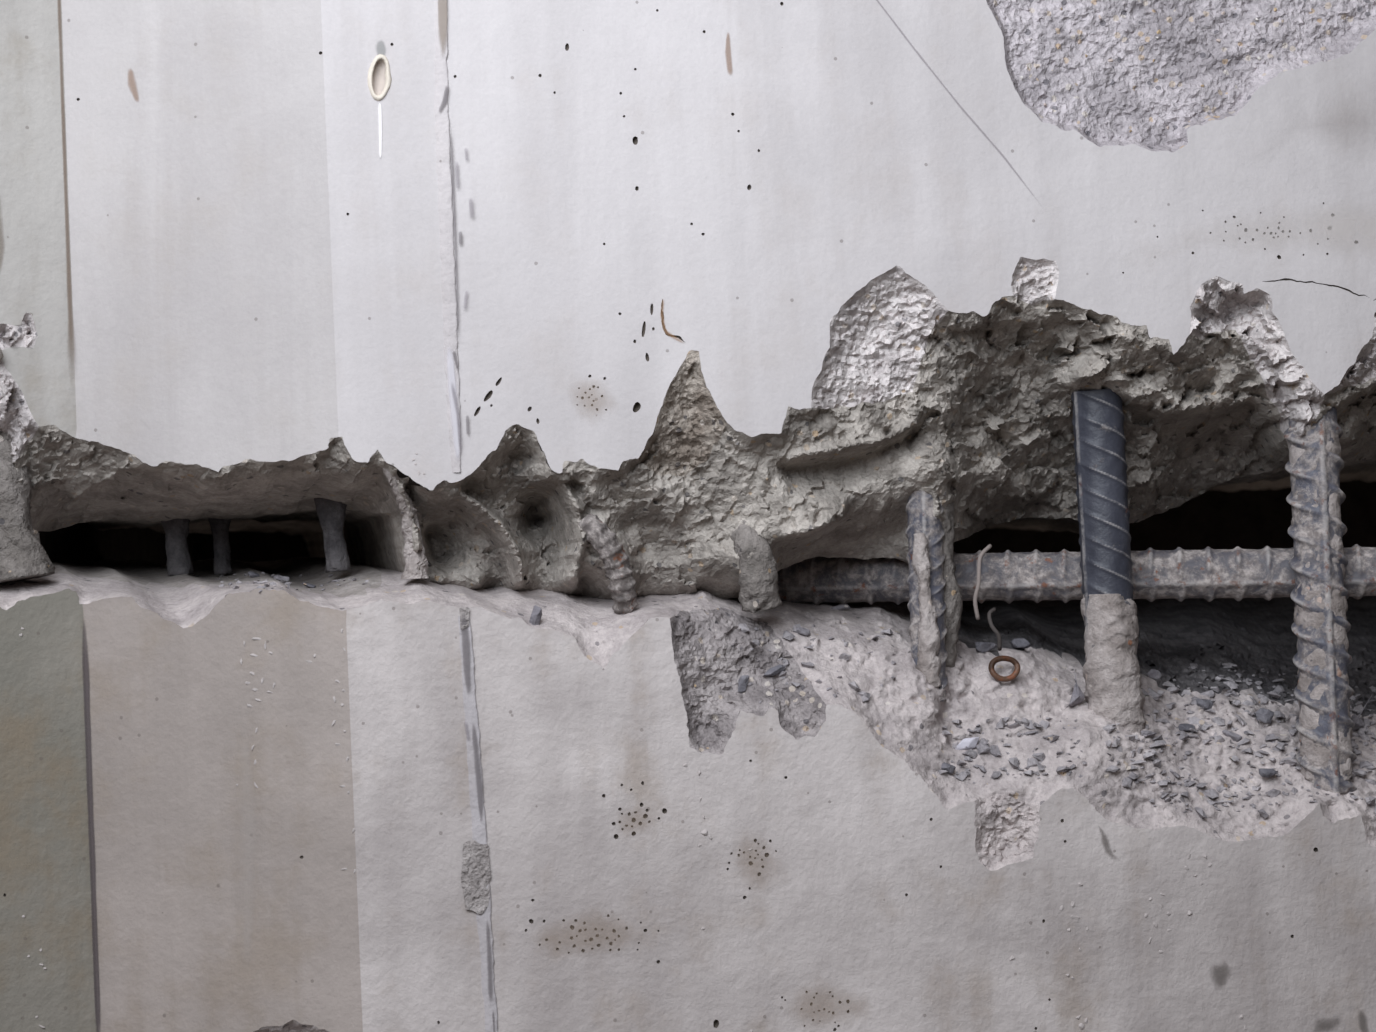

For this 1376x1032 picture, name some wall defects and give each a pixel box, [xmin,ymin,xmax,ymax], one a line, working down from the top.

spalling [986,0,1376,152]
spalling [1209,202,1335,259]
crack [1262,278,1376,301]
spalling [0,257,1376,871]
spalling [726,839,777,899]
spalling [254,1020,329,1032]